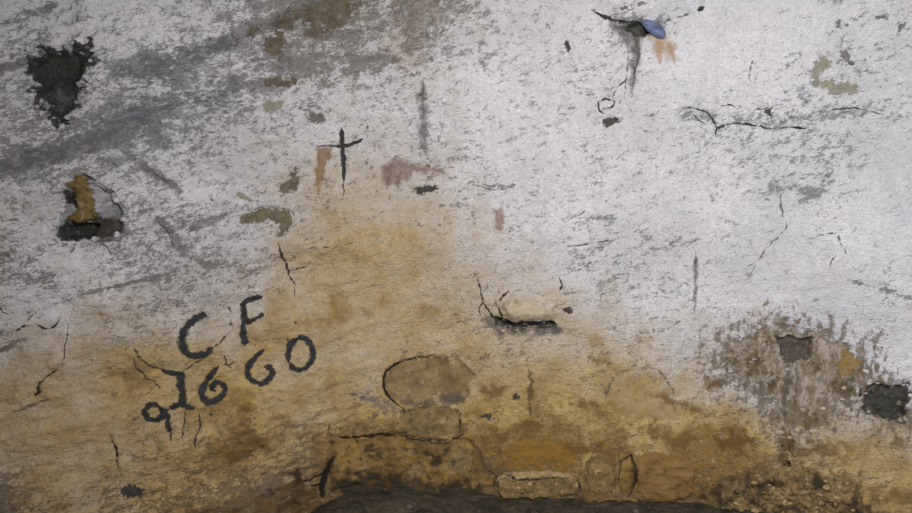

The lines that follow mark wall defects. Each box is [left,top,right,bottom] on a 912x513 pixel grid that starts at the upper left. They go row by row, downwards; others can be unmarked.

spalling [17,37,100,129]
peeling [809,49,866,98]
crack [680,104,806,135]
spalling [52,173,130,244]
crack [477,277,496,319]
leakage [802,314,853,345]
leakage [520,359,541,435]
leakage [699,301,831,465]
peeling [716,316,912,447]
leakage [823,331,911,432]
leakage [330,468,483,495]
leakage [811,474,828,489]